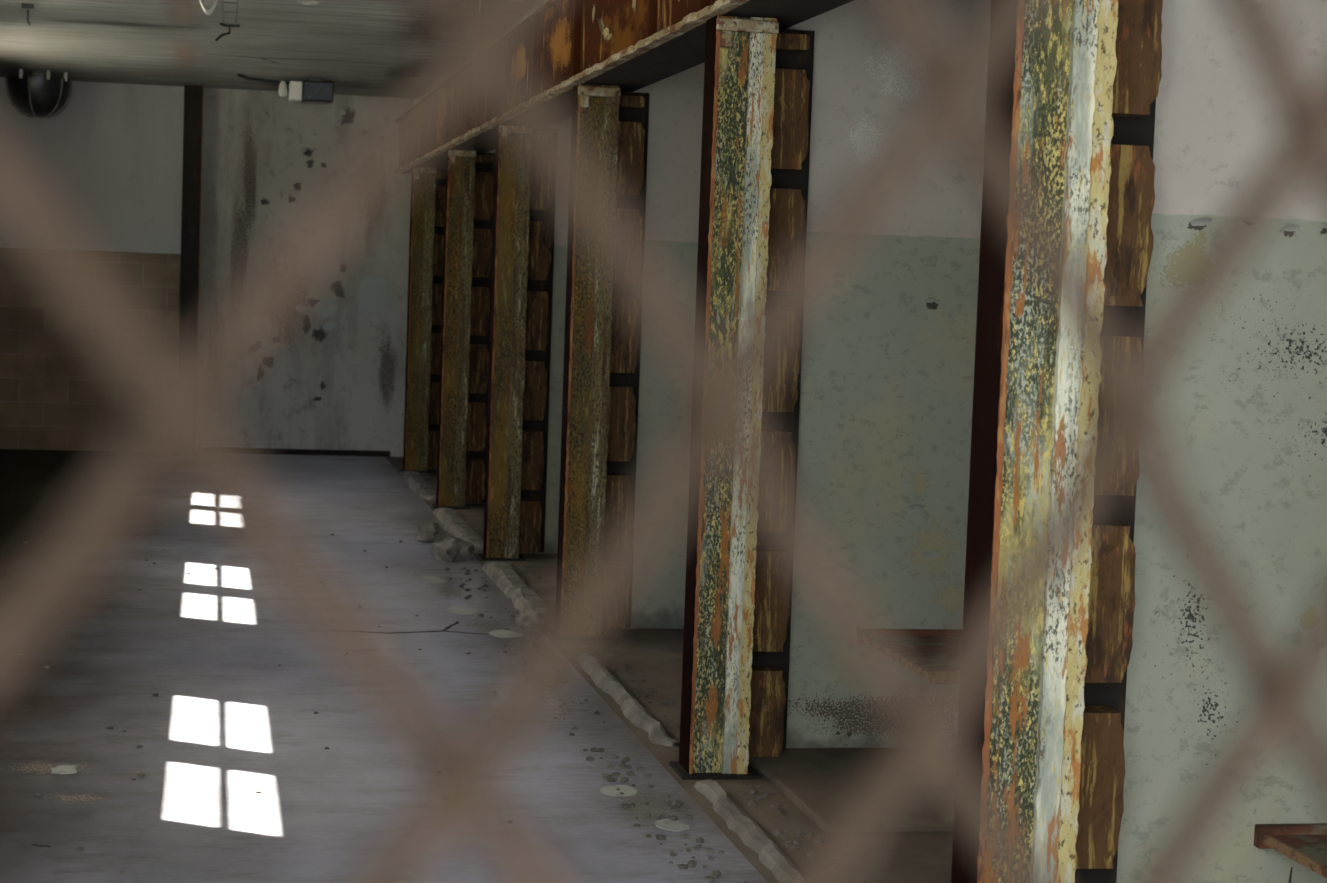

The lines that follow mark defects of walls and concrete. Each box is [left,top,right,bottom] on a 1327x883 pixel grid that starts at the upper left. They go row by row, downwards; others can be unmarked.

corrosion [518,6,574,81]
peeling [300,147,327,169]
peeling [295,263,347,342]
water stain [1208,288,1327,477]
water stain [1153,575,1240,765]